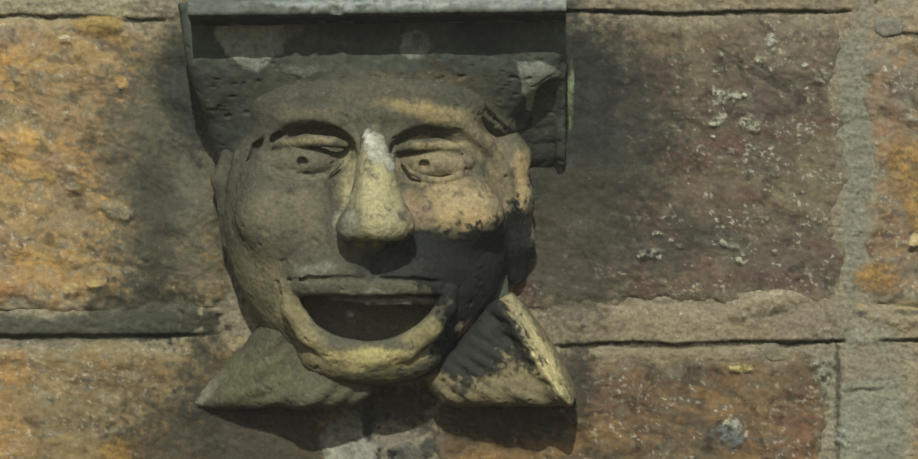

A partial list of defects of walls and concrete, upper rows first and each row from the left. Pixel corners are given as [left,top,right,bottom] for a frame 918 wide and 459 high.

damp [0,13,239,344]
damp [357,2,692,395]
spalling [517,60,565,112]
damp [104,322,600,459]